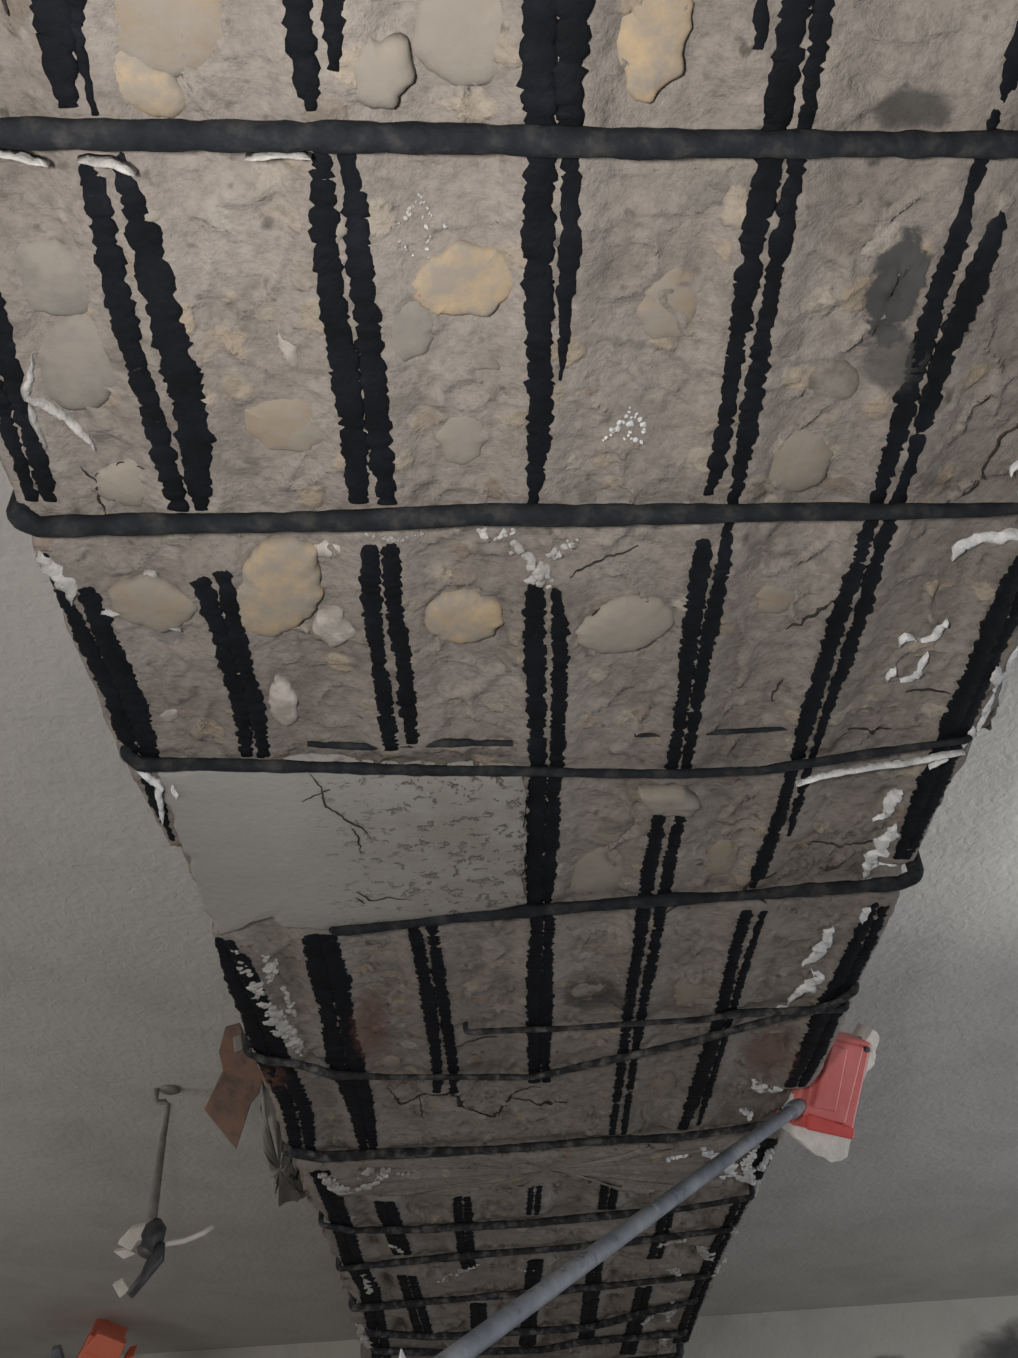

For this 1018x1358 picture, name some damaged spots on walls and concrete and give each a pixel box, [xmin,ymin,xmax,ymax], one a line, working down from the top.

spalling [0,0,1018,132]
spalling [0,148,1018,516]
crack [947,423,1018,503]
crack [302,773,370,853]
spalling [32,514,1018,1358]
crack [388,1085,568,1118]